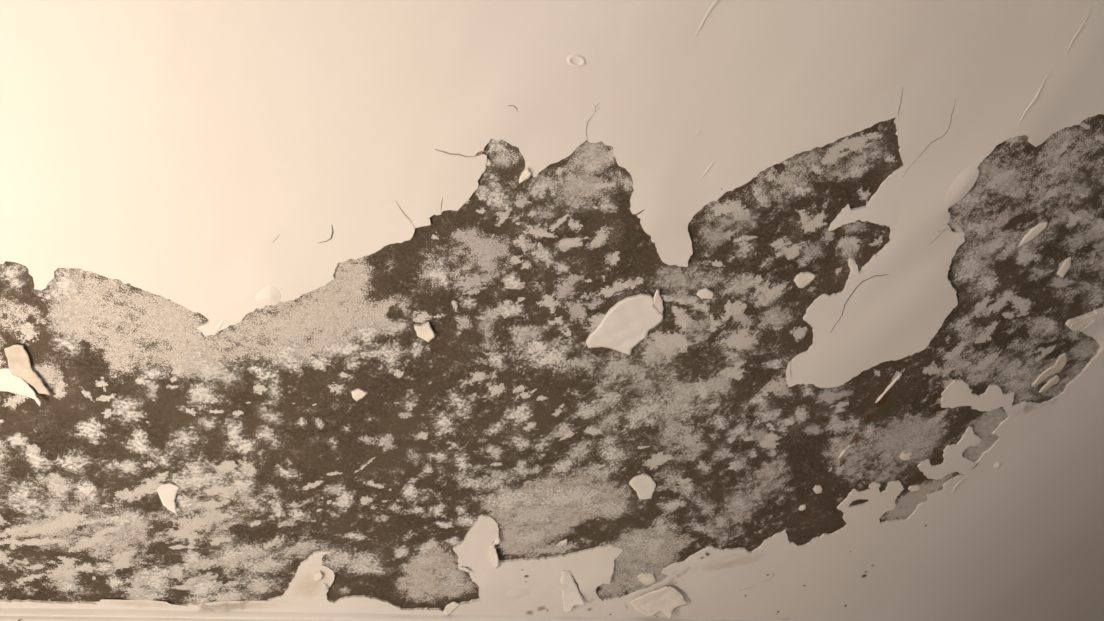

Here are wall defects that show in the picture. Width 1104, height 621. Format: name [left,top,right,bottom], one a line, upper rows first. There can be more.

flaking render [1018,222,1048,247]
flaking render [1057,257,1071,278]
peeling [653,289,664,314]
flaking render [414,322,435,342]
peeling [4,344,50,395]
flaking render [1031,353,1068,387]
peeling [0,367,41,406]
flaking render [351,388,368,401]
peeling [157,483,180,515]
leakage [93,565,335,610]
peeling [631,566,692,619]